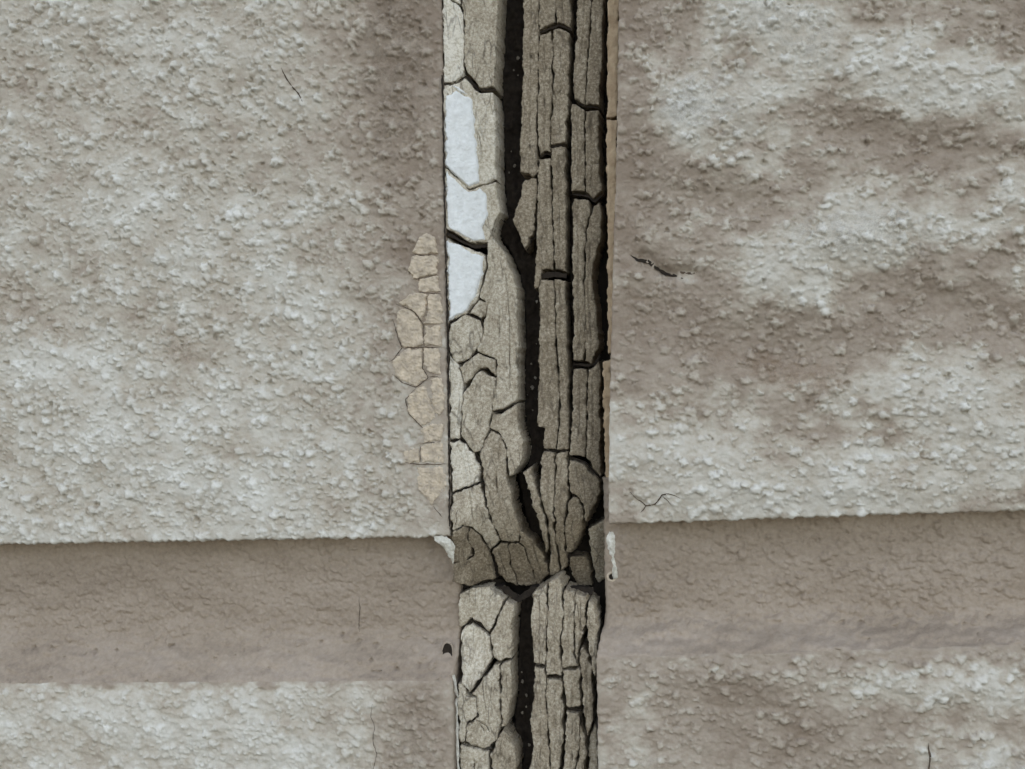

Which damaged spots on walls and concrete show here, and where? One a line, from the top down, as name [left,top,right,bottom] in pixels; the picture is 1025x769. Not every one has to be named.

crack [389,0,603,769]